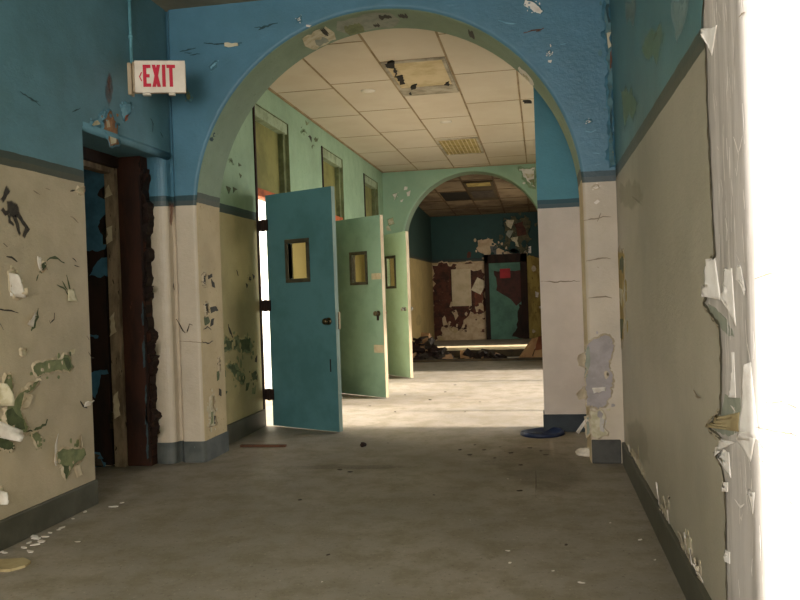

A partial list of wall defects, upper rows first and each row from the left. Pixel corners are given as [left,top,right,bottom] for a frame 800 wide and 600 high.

peeling [295,13,408,50]
spalling [90,101,133,149]
peeling [7,265,29,301]
peeling [36,256,64,281]
peeling [203,302,218,327]
peeling [432,212,542,341]
peeling [700,0,800,600]
spalling [576,245,628,440]
peeling [0,347,75,453]
peeling [207,331,258,432]
peeling [54,433,87,481]
peeling [0,485,9,505]